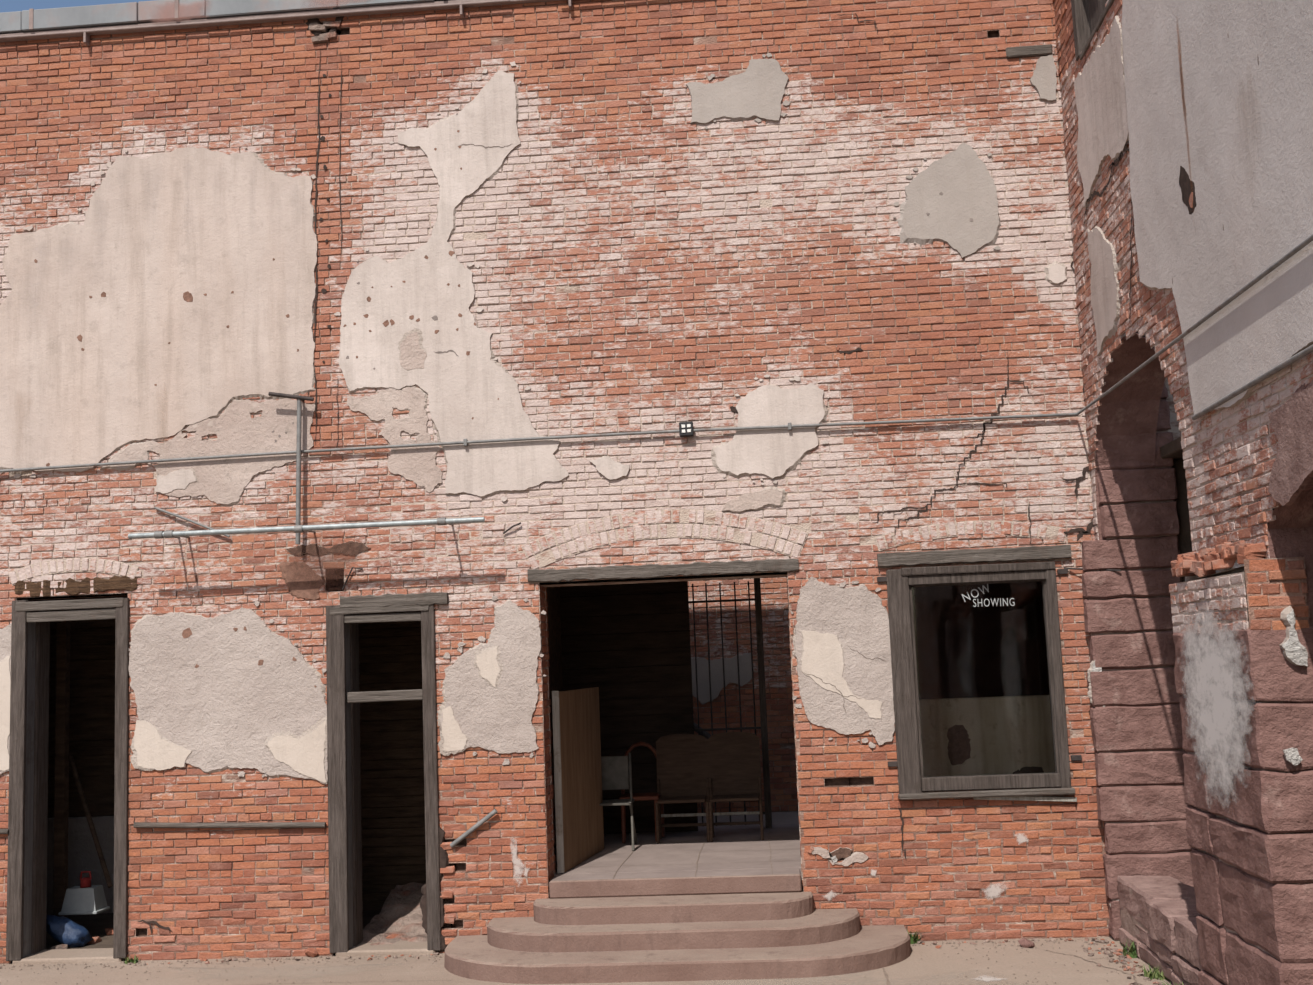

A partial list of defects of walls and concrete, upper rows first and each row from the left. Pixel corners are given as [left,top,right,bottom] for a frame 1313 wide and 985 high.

flaking render [686,53,790,129]
flaking render [0,61,569,507]
crack [313,50,343,446]
flaking render [710,374,830,514]
crack [872,350,1031,543]
crack [1062,466,1094,541]
flaking render [0,624,12,775]
flaking render [128,601,328,784]
flaking render [789,576,895,748]
flaking render [1283,748,1303,765]
flaking render [1279,606,1308,666]
spalling [420,826,456,952]